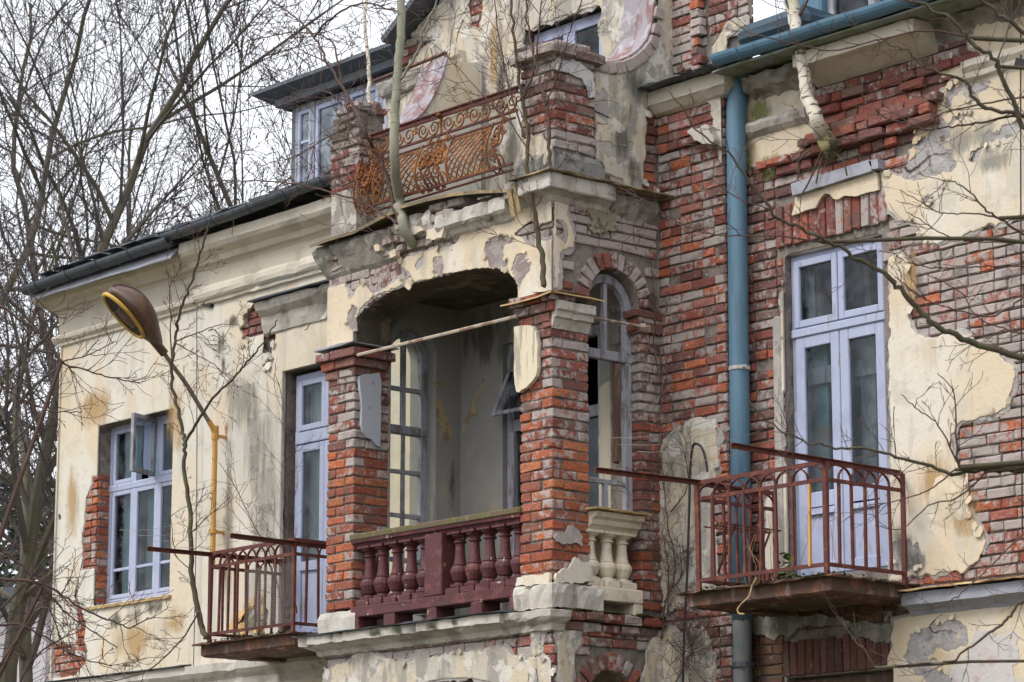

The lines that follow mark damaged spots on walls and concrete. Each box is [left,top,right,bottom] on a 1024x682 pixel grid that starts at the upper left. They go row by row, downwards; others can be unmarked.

flaking render [238,302,276,372]
flaking render [329,98,731,588]
flaking render [747,39,1024,590]
leakage [230,378,275,544]
flaking render [82,474,110,606]
flaking render [47,585,87,680]
flaking render [378,631,558,682]
flaking render [571,630,658,682]
flaking render [906,613,1019,682]